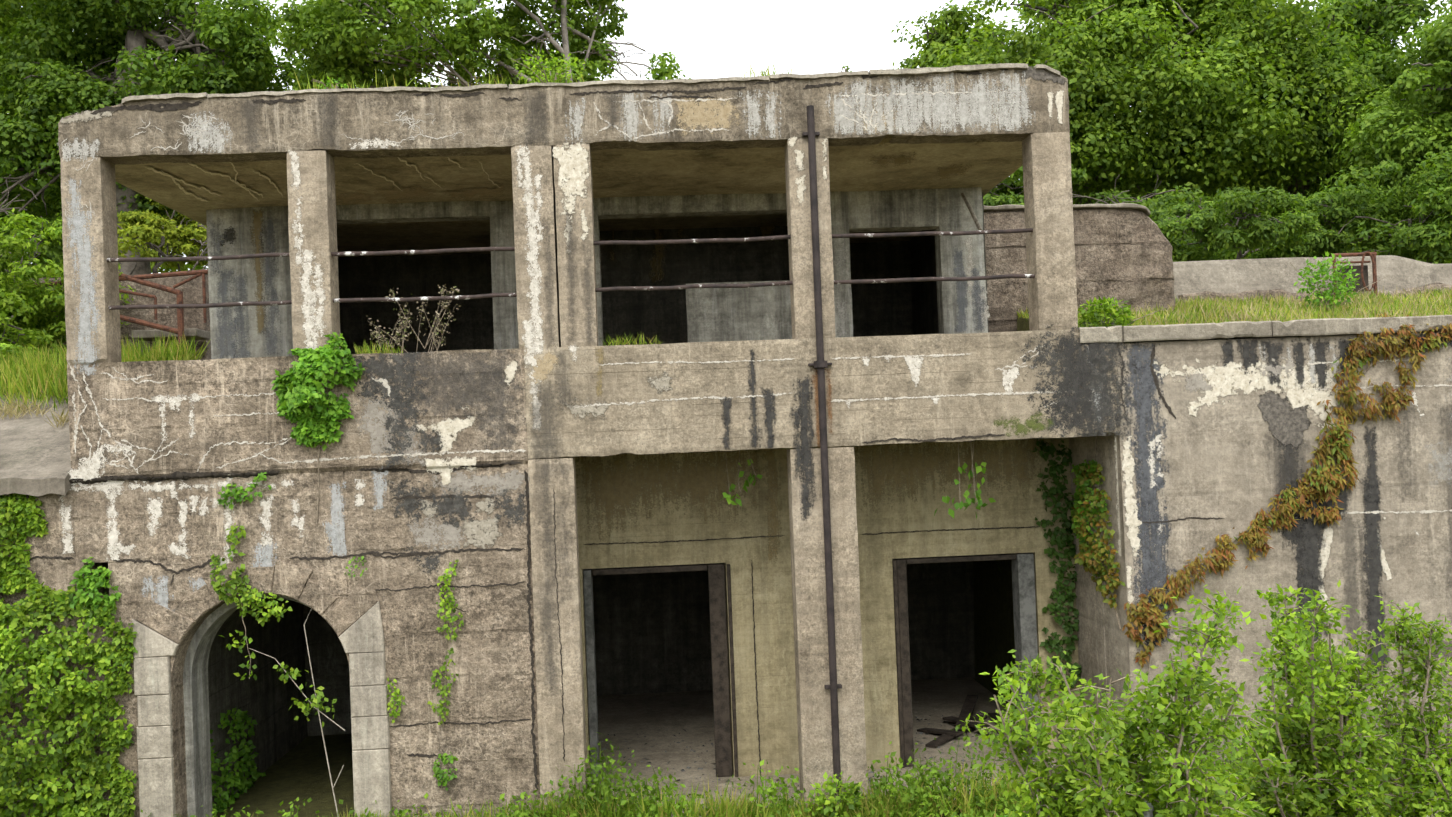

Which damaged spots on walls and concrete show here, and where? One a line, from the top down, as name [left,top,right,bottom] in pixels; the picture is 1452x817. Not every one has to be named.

peeling [552,142,590,253]
spalling [407,407,530,550]
damp [575,350,816,560]
peeling [1154,353,1341,448]
damp [1221,336,1352,391]
damp [1402,334,1452,352]
crack [68,358,795,789]
damp [1274,427,1393,688]